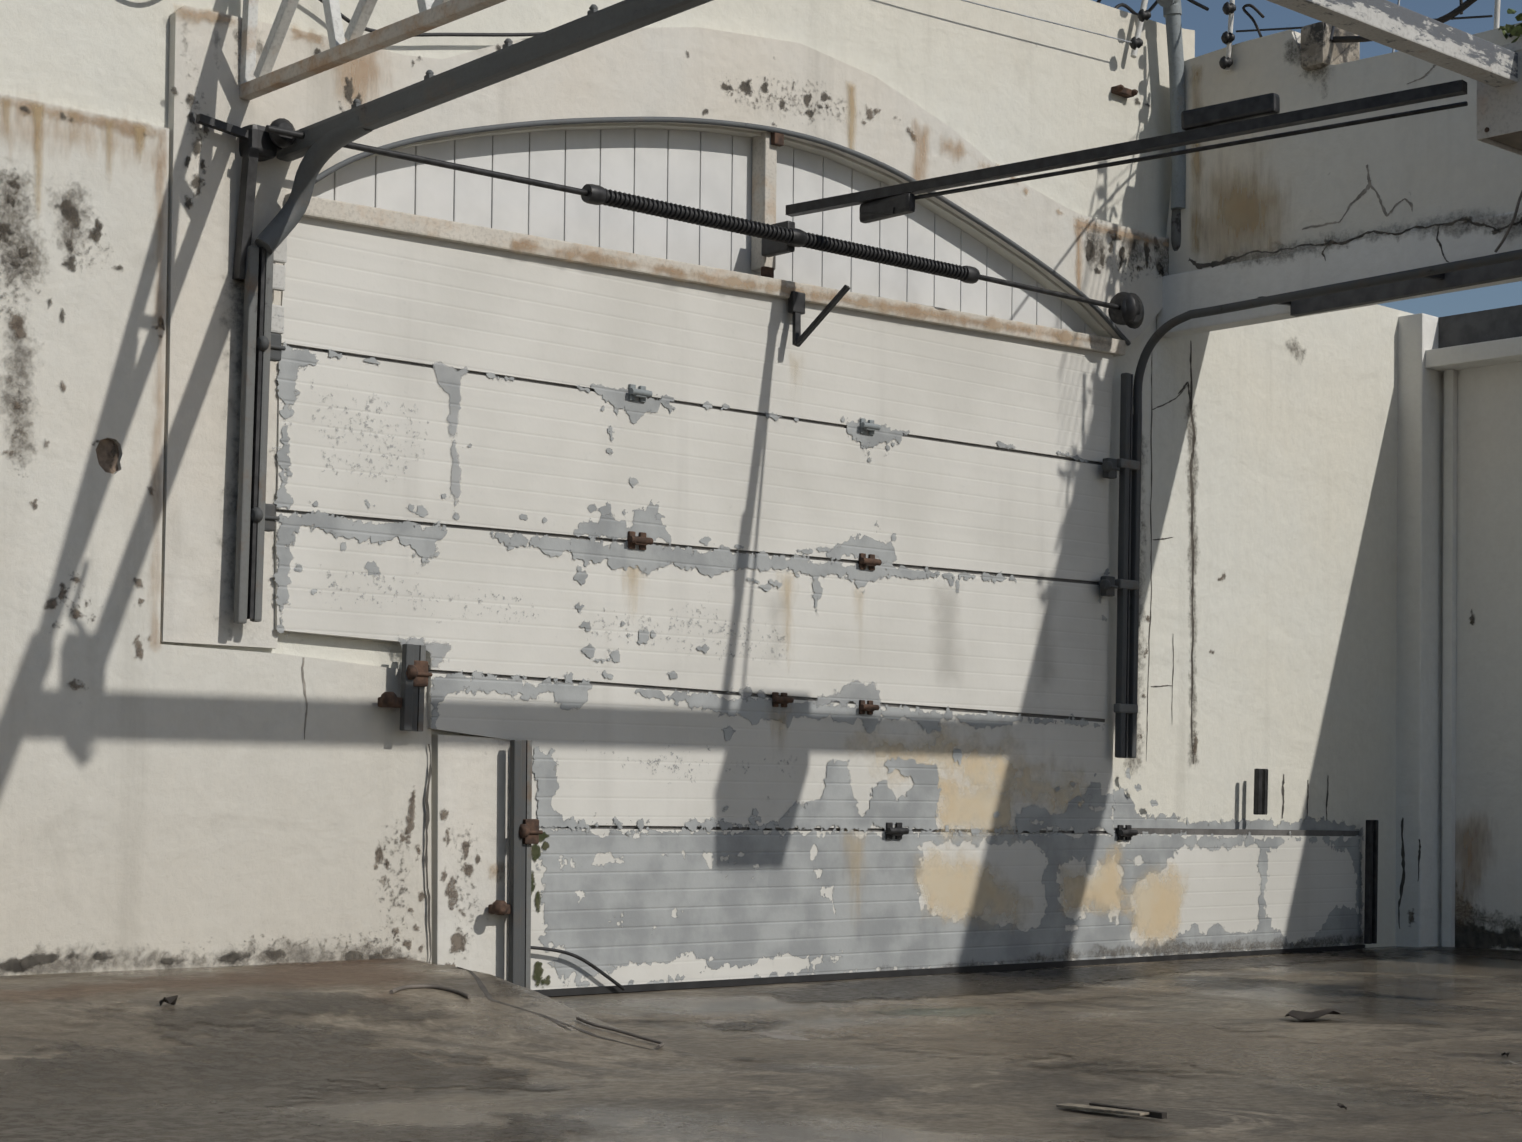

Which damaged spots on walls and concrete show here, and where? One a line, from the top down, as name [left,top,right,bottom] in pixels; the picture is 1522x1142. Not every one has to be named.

corrosion [21,103,145,145]
water stain [63,189,109,265]
crack [1188,165,1521,269]
mould [0,175,49,454]
hole [92,438,120,474]
peeling [272,342,472,637]
peeling [491,499,1017,613]
crack [1146,341,1196,764]
peeling [399,603,746,729]
mould [0,831,425,975]
peeling [532,747,1364,987]
water stain [760,855,1522,1002]